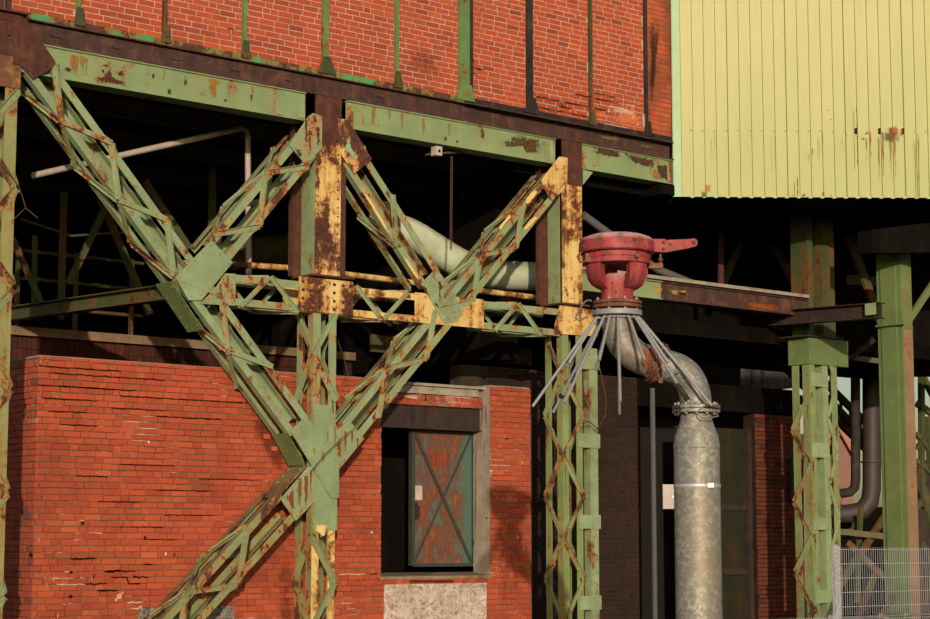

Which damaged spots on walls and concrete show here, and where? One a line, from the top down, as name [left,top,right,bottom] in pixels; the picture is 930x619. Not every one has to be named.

rust [296,115,332,157]
rust [865,127,903,174]
crack [75,464,174,477]
crack [97,478,254,503]
crack [121,514,215,540]
crack [69,557,153,592]